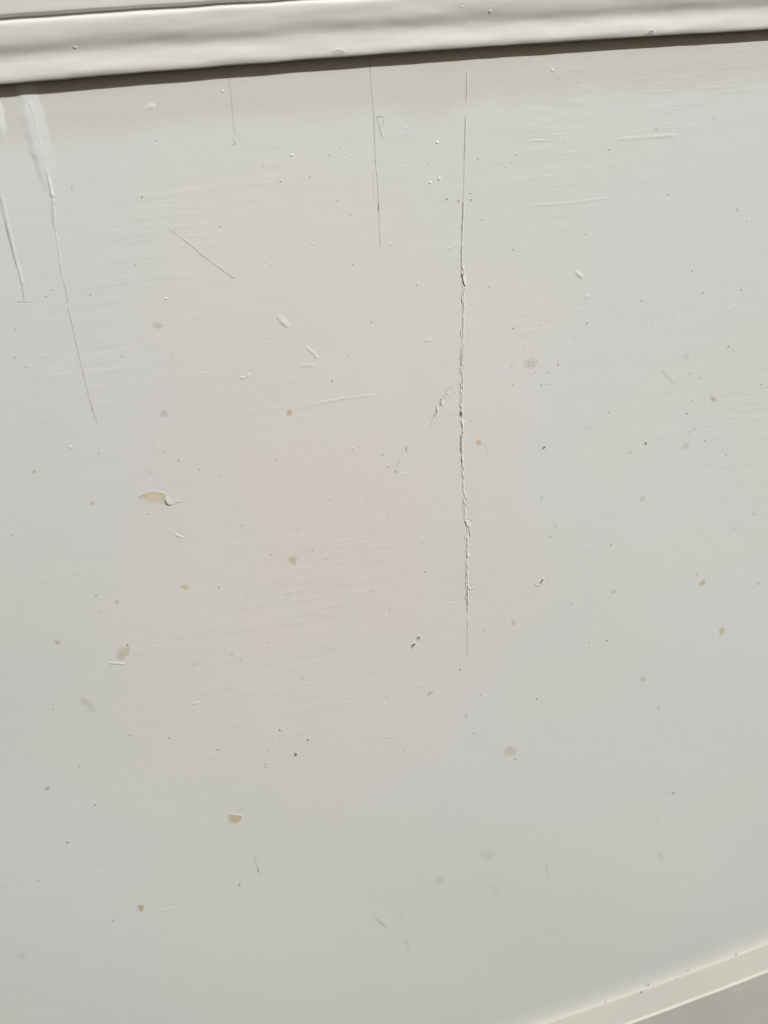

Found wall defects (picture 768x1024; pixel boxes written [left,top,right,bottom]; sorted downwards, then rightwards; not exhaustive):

peeling [136,490,181,515]
crack [459,70,474,655]